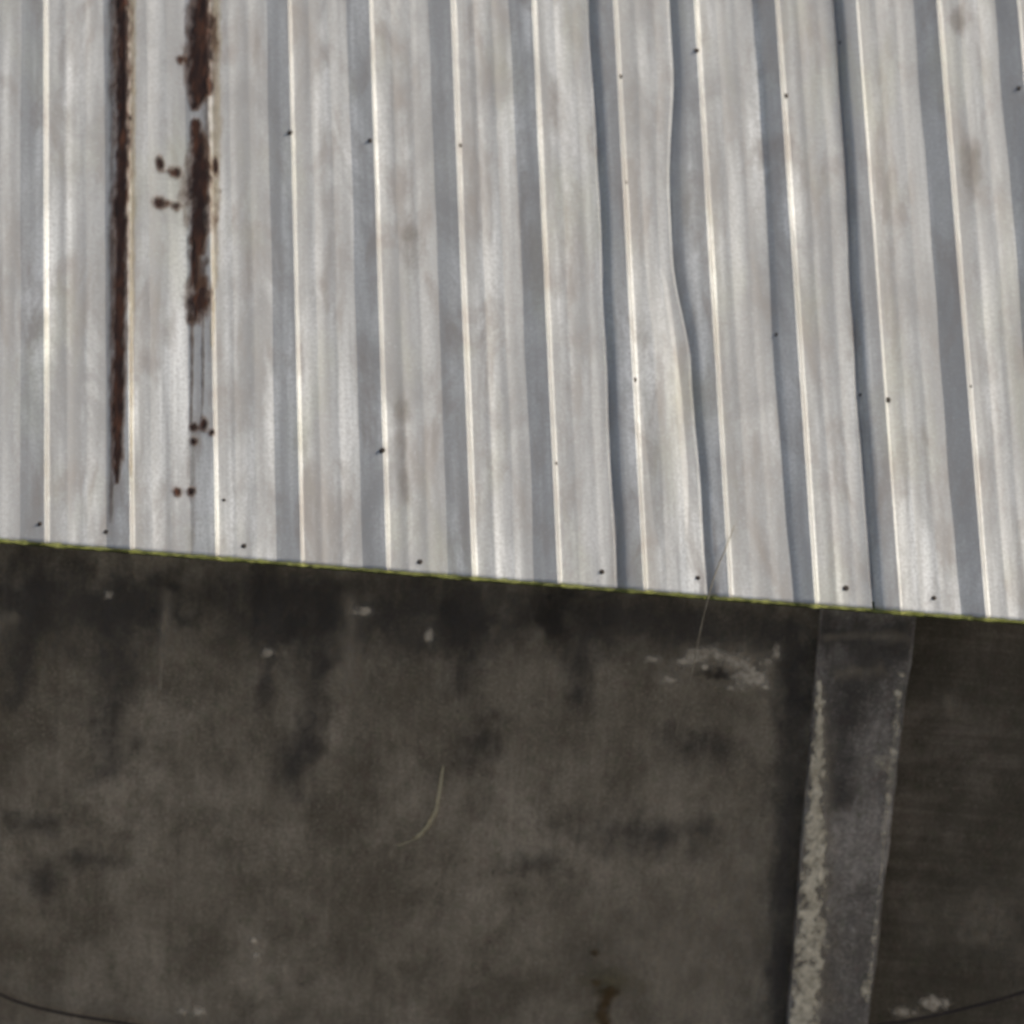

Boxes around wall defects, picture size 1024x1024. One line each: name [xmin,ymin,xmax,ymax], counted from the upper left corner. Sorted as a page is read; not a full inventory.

corrosion [109,0,132,498]
corrosion [155,0,219,445]
corrosion [174,487,196,496]
water stain [203,565,805,914]